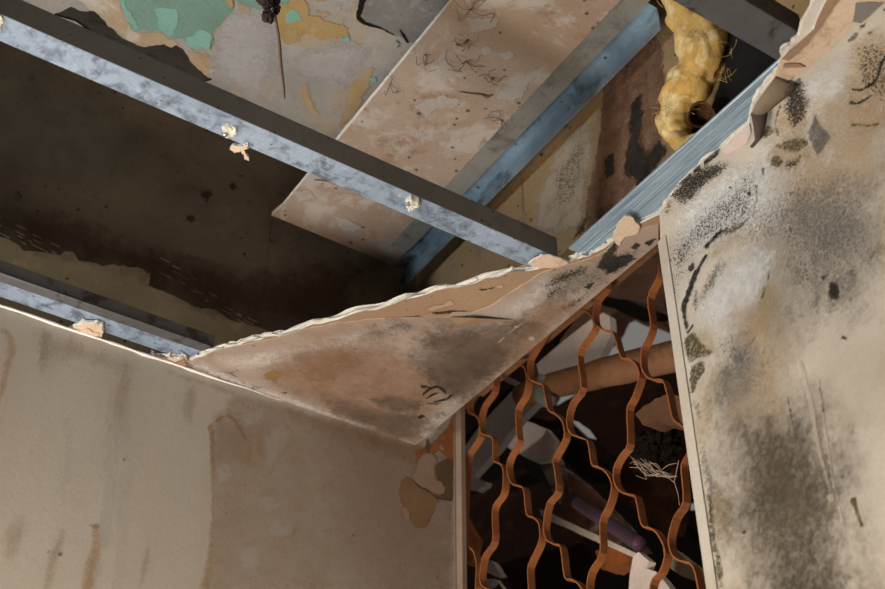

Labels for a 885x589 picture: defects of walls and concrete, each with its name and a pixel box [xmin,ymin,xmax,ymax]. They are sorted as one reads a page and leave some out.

peeling [80,0,263,76]
peeling [277,0,350,45]
crack [356,0,409,48]
peeling [339,67,376,127]
leakage [666,24,885,393]
peeling [101,332,164,355]
peeling [0,217,270,347]
peeling [407,300,465,317]
leakage [705,271,834,589]
peeling [399,452,453,541]